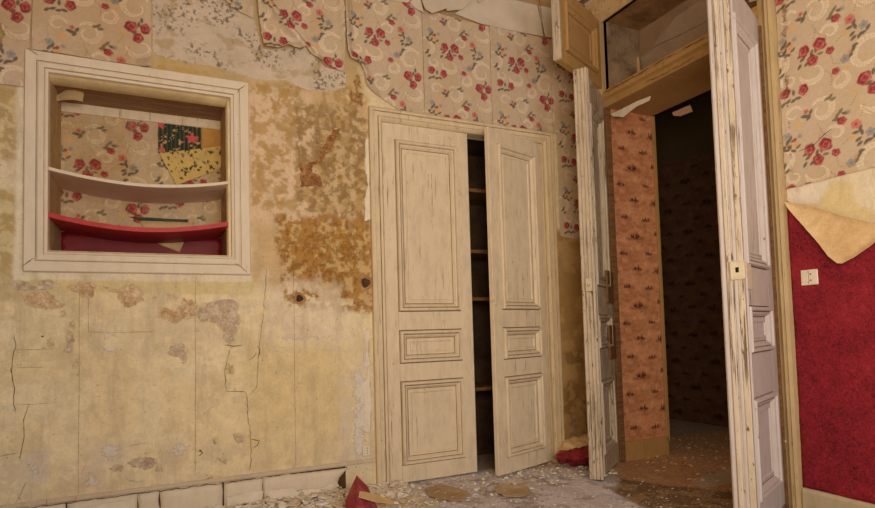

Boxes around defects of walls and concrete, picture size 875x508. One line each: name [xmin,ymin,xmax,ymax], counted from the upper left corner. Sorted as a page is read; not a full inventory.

flaking render [151,0,347,92]
flaking render [8,279,242,369]
crack [2,265,345,508]